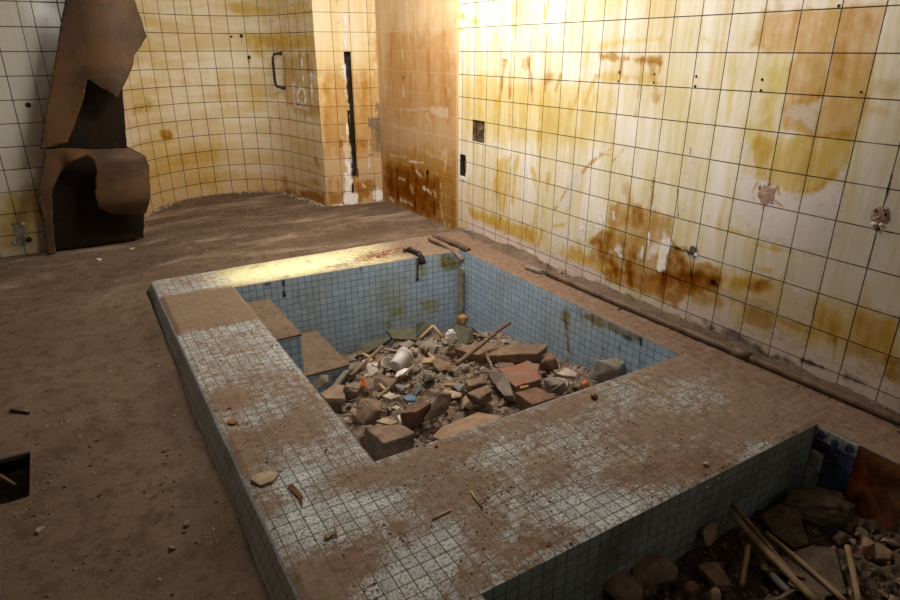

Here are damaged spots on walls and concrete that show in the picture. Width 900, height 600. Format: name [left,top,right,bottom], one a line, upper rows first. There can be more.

peeling [341,64,349,109]
peeling [332,104,450,226]
spalling [758,181,776,205]
spalling [871,207,890,231]